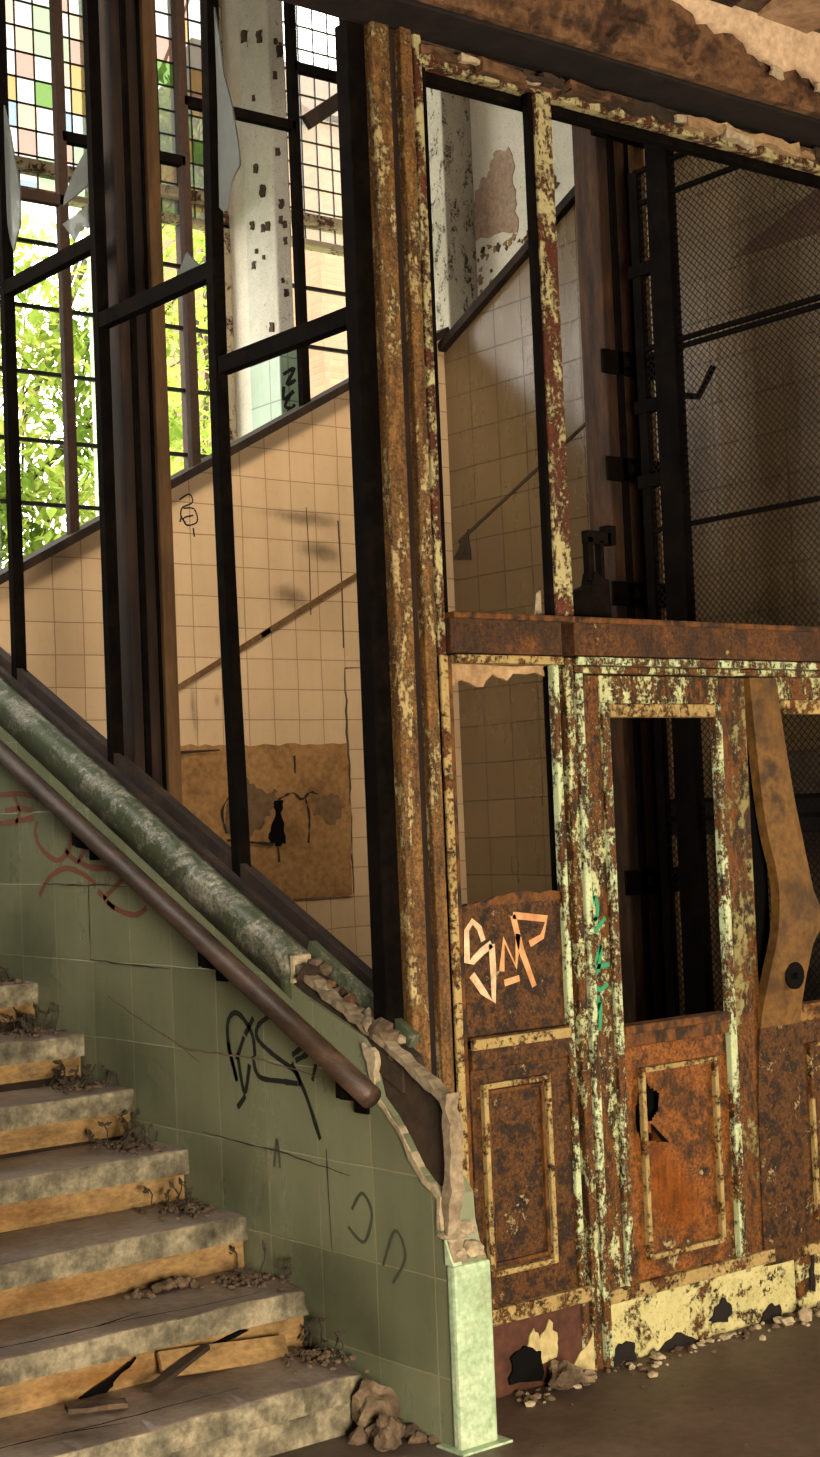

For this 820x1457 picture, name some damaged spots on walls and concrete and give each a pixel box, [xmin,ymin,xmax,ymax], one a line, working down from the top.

flaking render [672,0,820,93]
flaking render [418,44,820,166]
peeling [474,147,528,293]
spalling [290,941,485,1263]
peeling [708,1297,732,1323]
peeling [759,1303,782,1324]
peeling [527,1319,558,1363]
peeling [574,1327,595,1370]
peeling [613,1341,637,1367]
peeling [659,1332,701,1352]